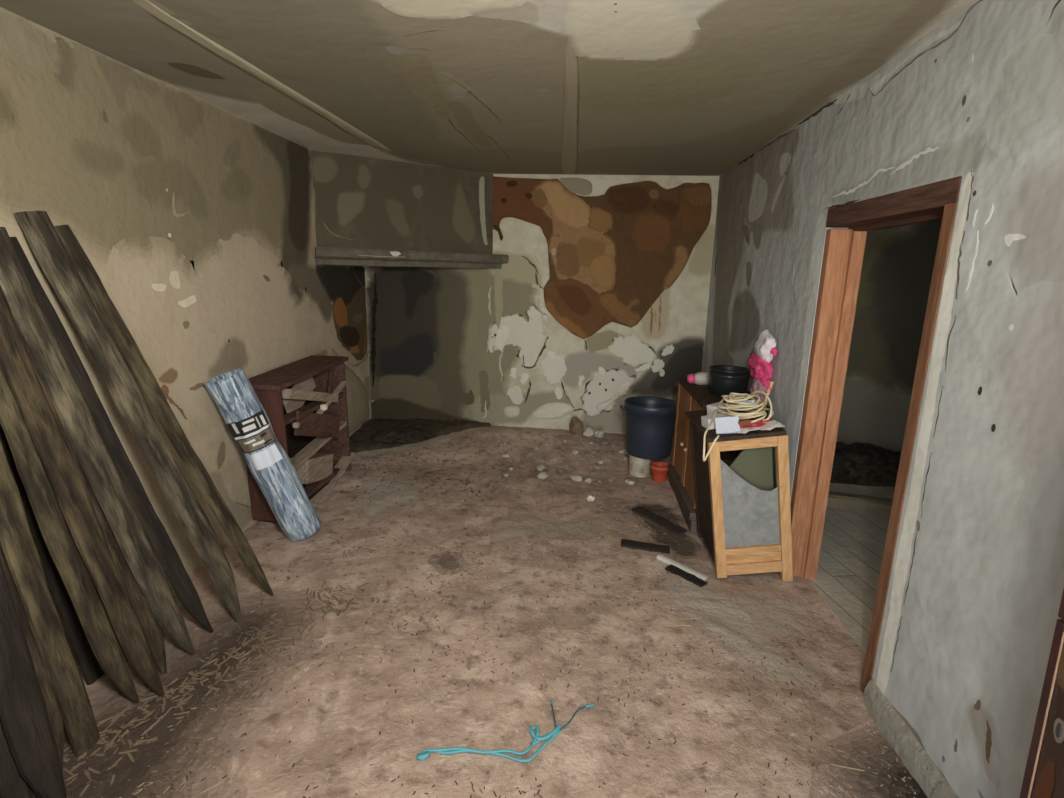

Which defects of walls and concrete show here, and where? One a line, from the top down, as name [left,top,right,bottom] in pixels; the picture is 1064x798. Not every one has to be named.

peeling [833,21,961,104]
damp [0,0,959,434]
flaking render [479,176,711,417]